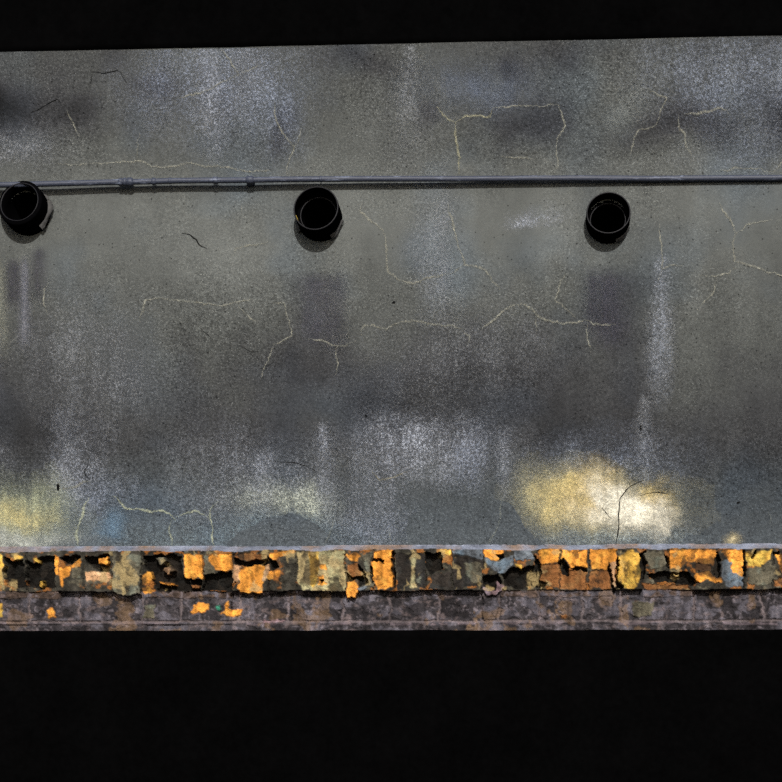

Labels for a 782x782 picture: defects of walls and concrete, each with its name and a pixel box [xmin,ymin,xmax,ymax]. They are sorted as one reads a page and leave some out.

water stain [531,471,668,545]
spalling [0,548,782,619]